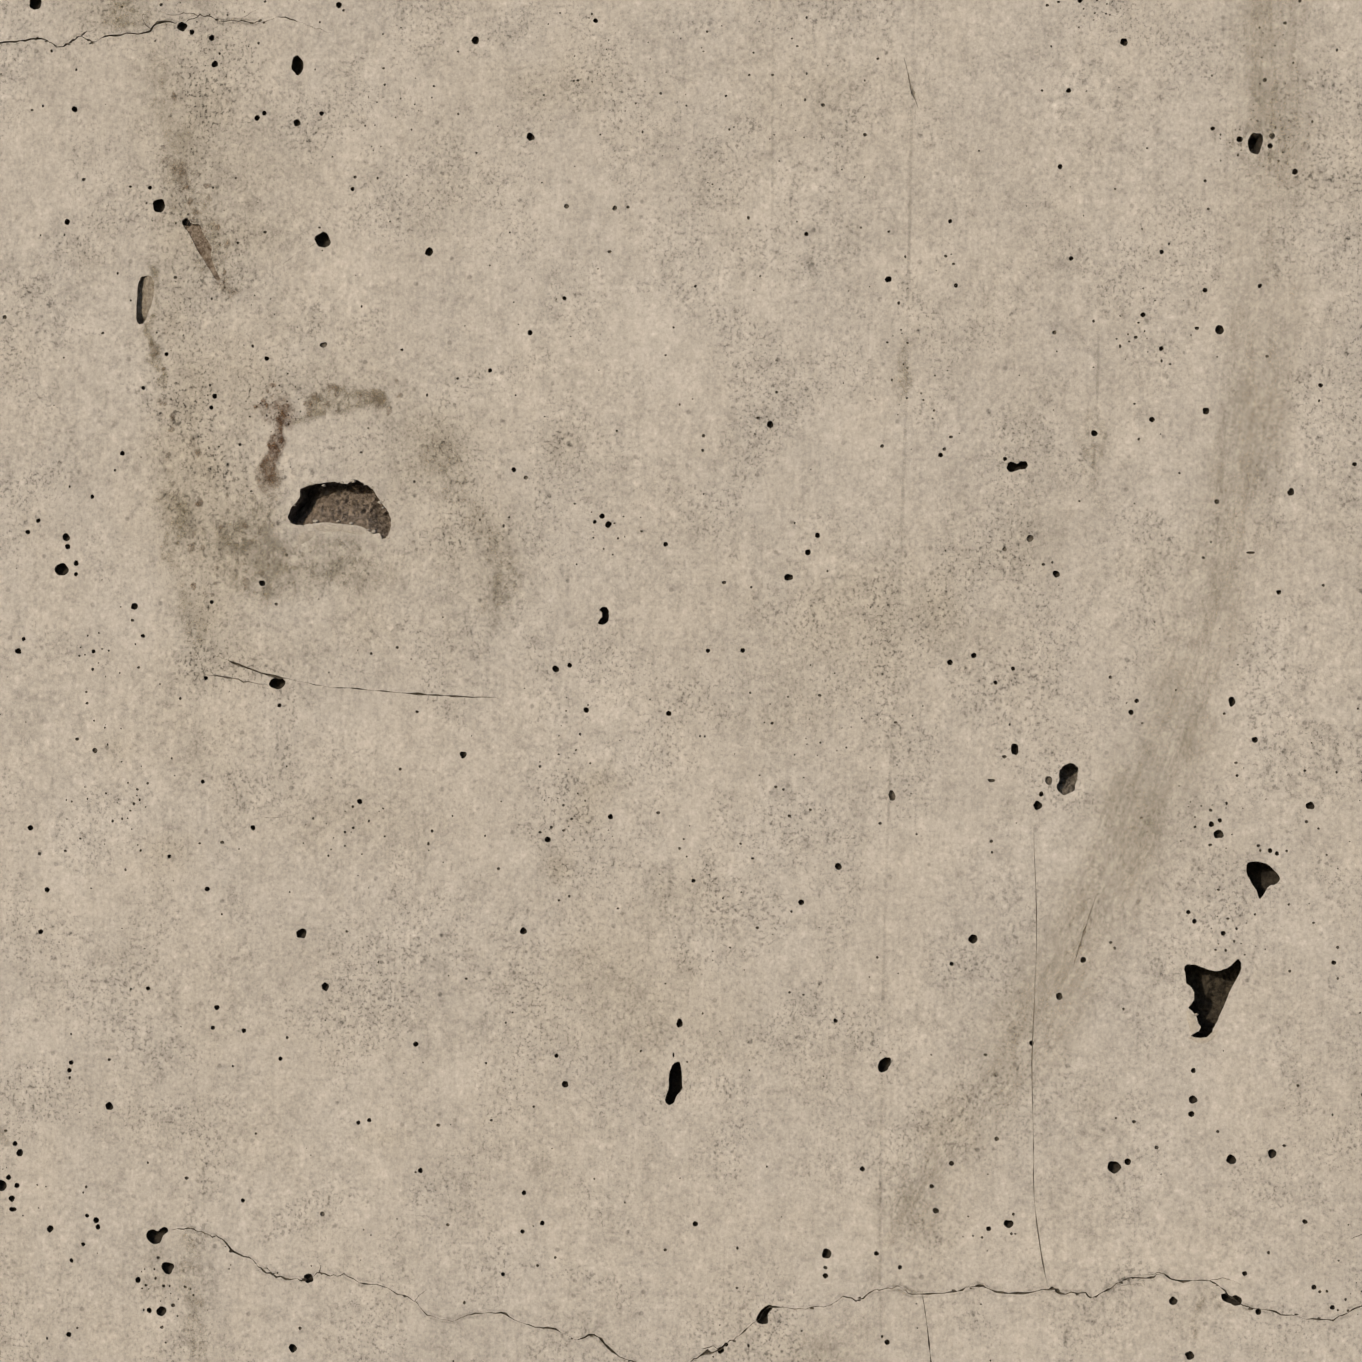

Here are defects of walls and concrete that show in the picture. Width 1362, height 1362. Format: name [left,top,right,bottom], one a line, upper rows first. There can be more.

crack [0,9,328,48]
spalling [288,479,391,544]
spalling [1246,861,1280,899]
spalling [1184,959,1241,1043]
crack [690,853,1362,1362]
crack [169,1227,635,1362]